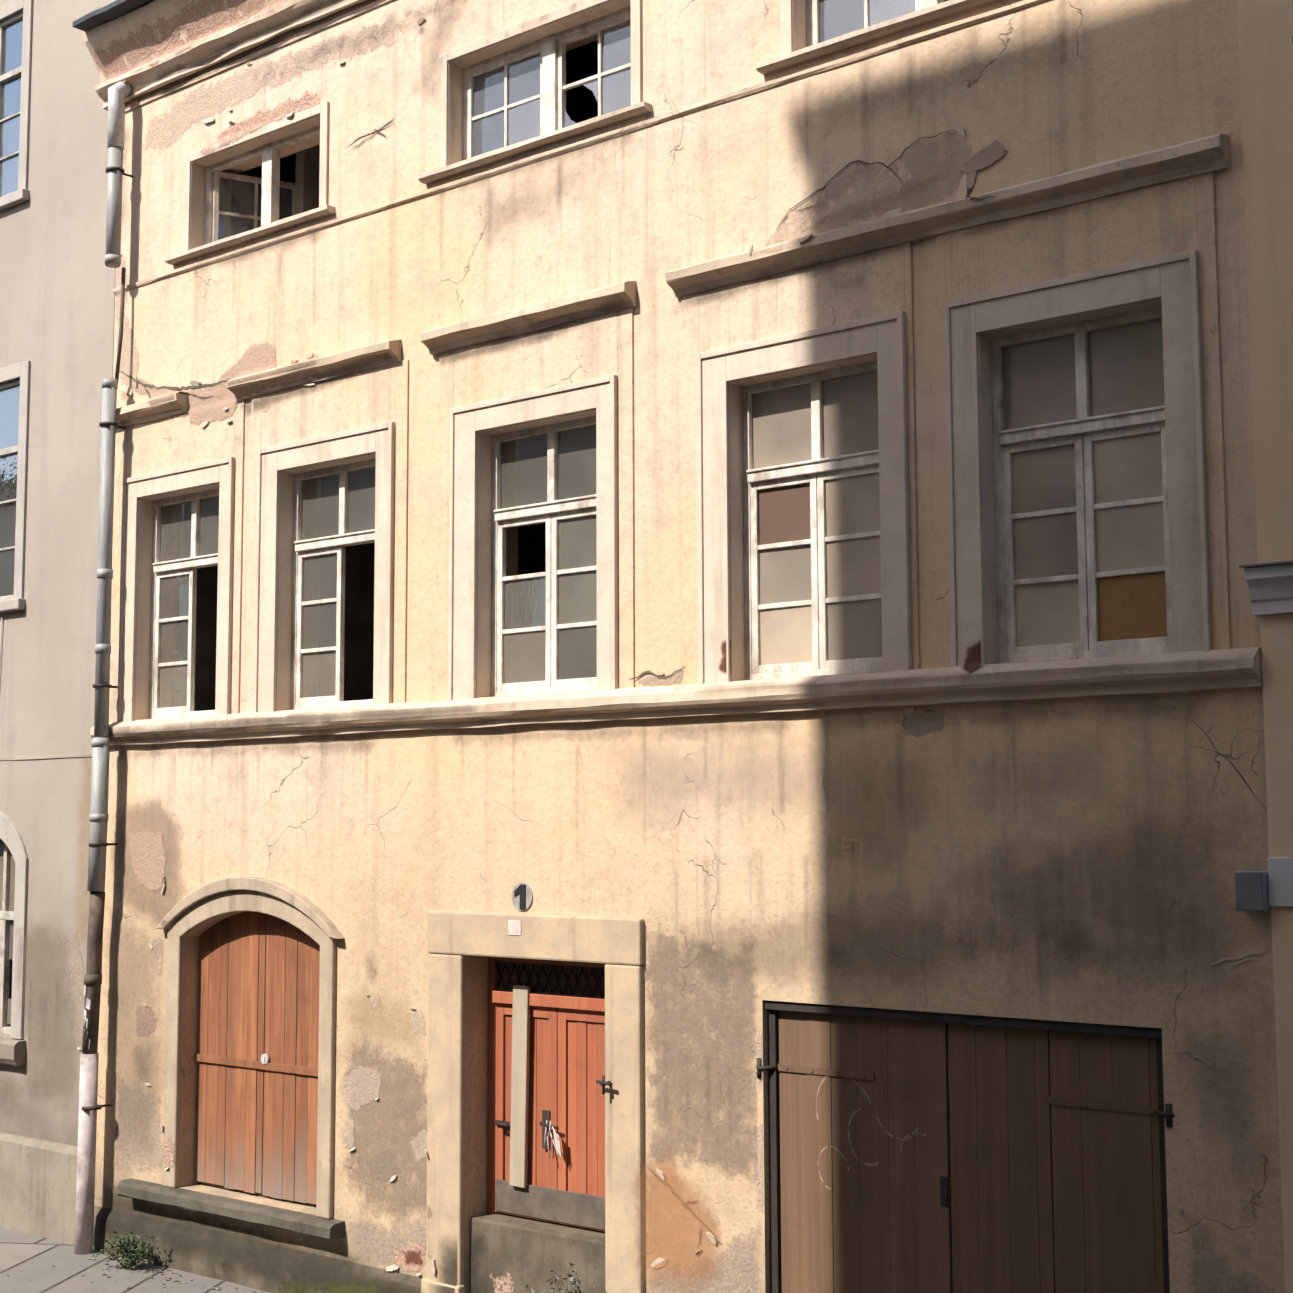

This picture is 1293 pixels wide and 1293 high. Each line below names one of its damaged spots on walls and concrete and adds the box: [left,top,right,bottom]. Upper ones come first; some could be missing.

flaking render [93,0,287,83]
flaking render [957,173,968,200]
flaking render [113,254,323,428]
crack [1193,721,1267,812]
flaking render [128,830,166,895]
leakage [649,936,753,1170]
flaking render [343,1066,381,1152]